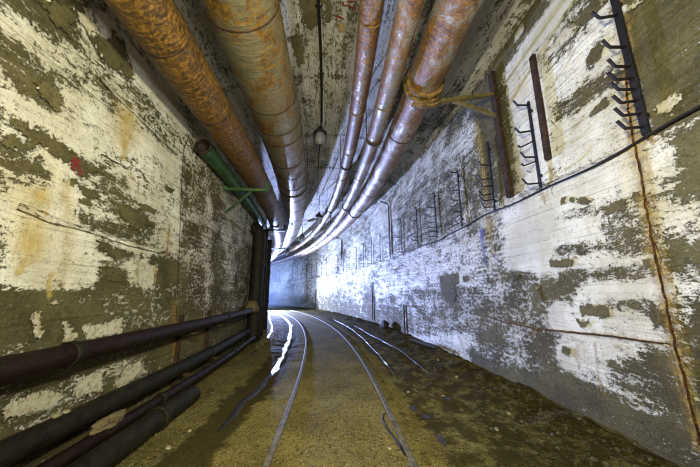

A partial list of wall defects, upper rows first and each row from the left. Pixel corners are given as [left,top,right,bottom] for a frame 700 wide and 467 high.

peeling [568,0,606,26]
peeling [86,29,135,80]
peeling [585,39,605,71]
peeling [588,96,609,117]
peeling [1,114,106,206]
peeling [560,196,592,205]
peeling [604,190,641,215]
peeling [114,201,157,233]
peeling [96,239,130,260]
peeling [549,258,574,268]
peeling [439,272,469,305]
peeling [572,303,625,329]